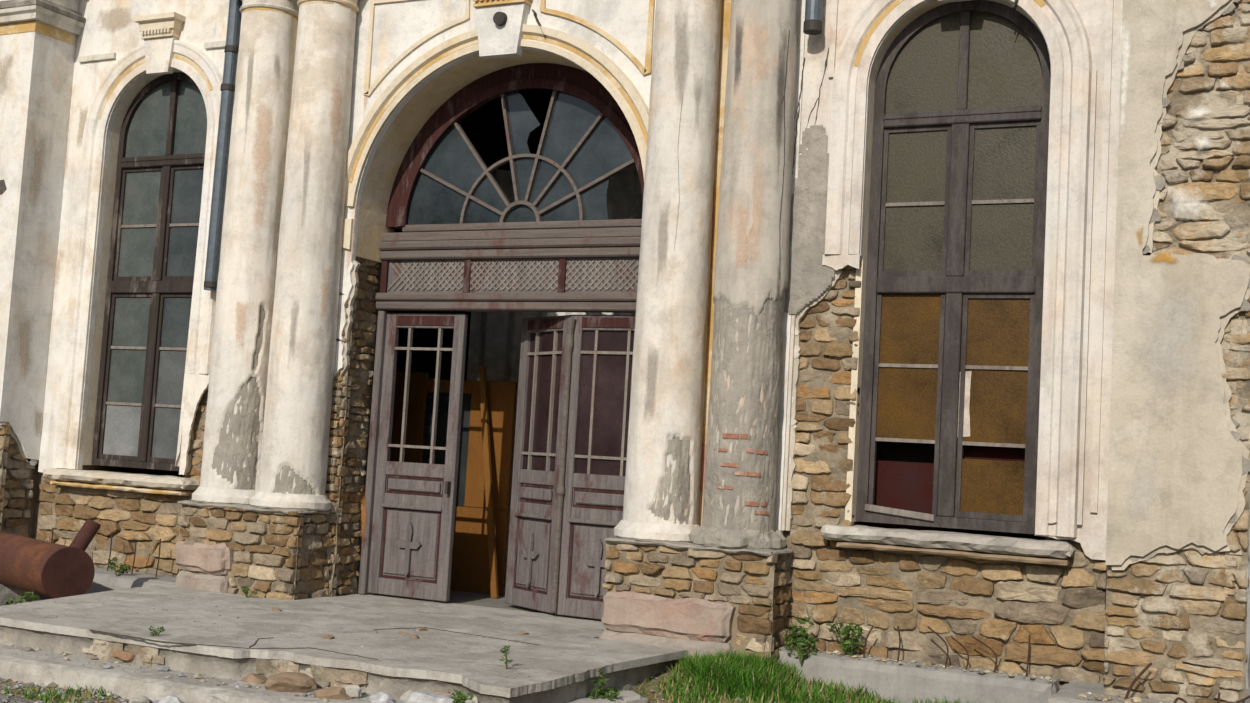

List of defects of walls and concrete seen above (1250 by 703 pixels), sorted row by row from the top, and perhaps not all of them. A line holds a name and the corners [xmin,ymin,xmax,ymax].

peeling [331,94,341,131]
flaking render [0,304,265,577]
flaking render [272,256,380,597]
flaking render [648,0,1250,703]